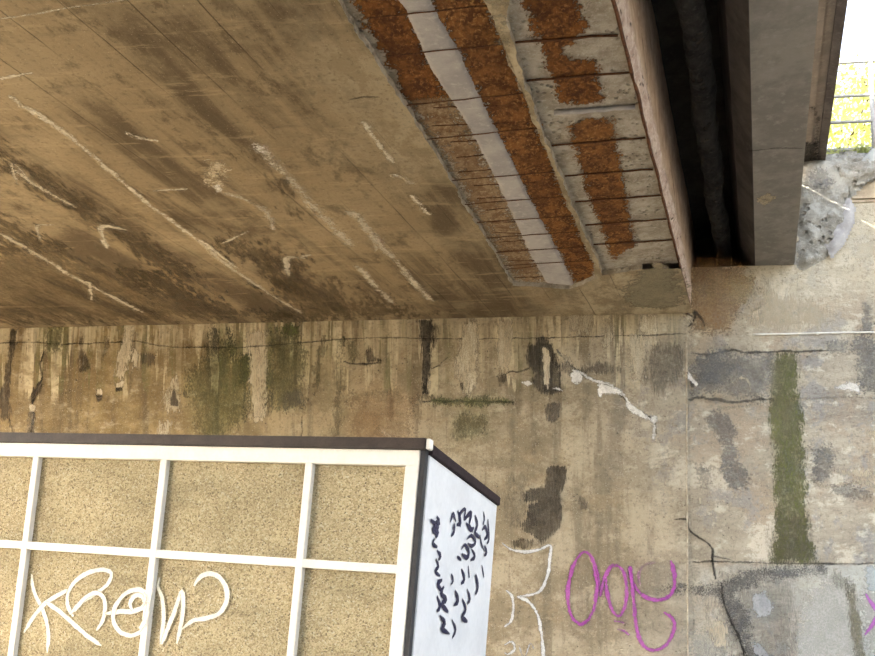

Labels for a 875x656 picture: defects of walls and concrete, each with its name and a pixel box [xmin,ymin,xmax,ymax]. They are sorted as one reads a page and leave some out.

spalling [338,0,692,303]
water stain [246,329,269,423]
water stain [495,315,658,439]
crack [688,396,772,409]
crack [693,348,829,356]
water stain [513,465,567,548]